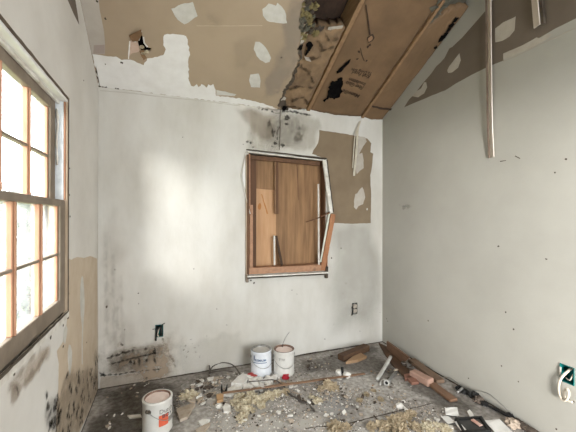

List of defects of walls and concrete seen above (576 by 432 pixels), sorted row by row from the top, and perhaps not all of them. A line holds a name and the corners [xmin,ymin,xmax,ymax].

spalling [128,30,149,60]
peeling [405,0,576,107]
peeling [312,130,373,224]
damp [46,372,91,432]
peeling [56,256,98,432]
damp [92,344,170,432]